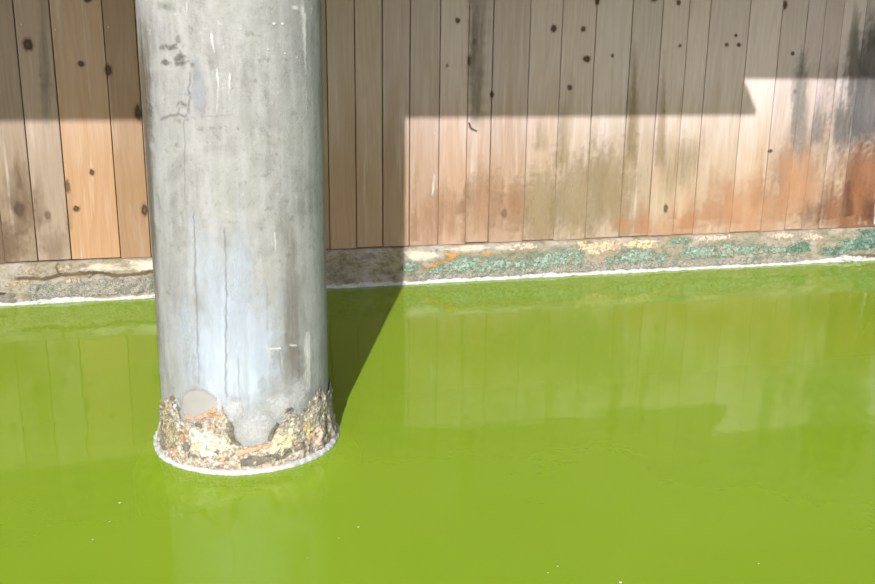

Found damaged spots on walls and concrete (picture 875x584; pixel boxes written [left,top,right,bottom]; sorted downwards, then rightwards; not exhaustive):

water stain [629,91,637,154]
water stain [794,72,805,150]
water stain [836,29,875,139]
rust [827,145,875,228]
water stain [0,225,18,263]
crack [0,263,153,295]
water stain [671,205,875,259]
spalling [153,381,338,488]